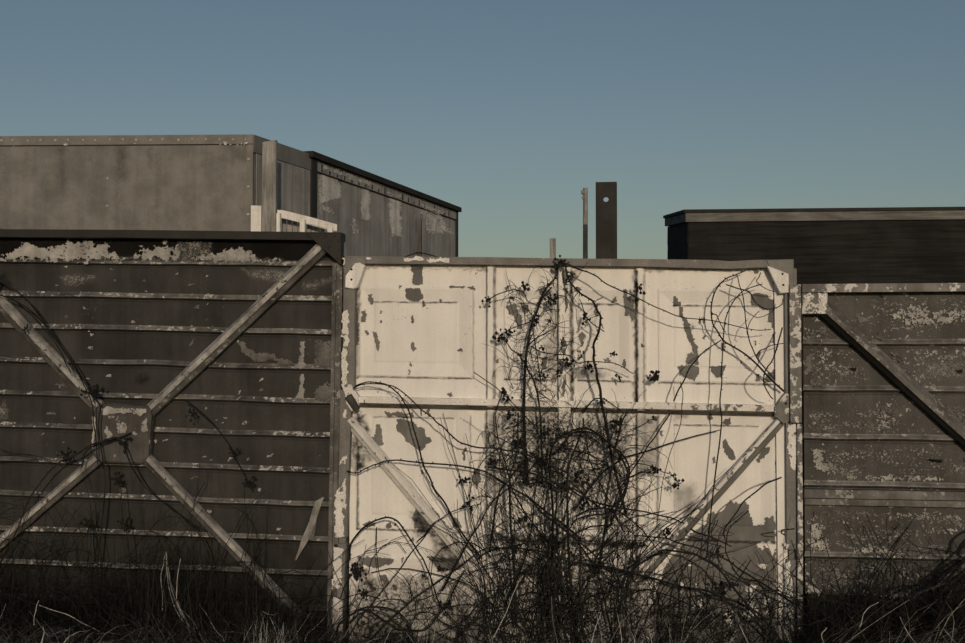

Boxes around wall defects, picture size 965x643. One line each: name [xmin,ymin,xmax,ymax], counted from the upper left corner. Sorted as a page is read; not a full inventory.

peeling [0,239,281,275]
peeling [399,256,449,309]
peeling [505,303,529,329]
peeling [750,293,775,342]
peeling [889,307,965,327]
peeling [237,294,382,403]
peeling [91,406,168,448]
peeling [372,409,431,451]
peeling [787,424,797,470]
peeling [811,449,944,482]
peeling [807,505,964,565]
peeling [649,500,794,643]